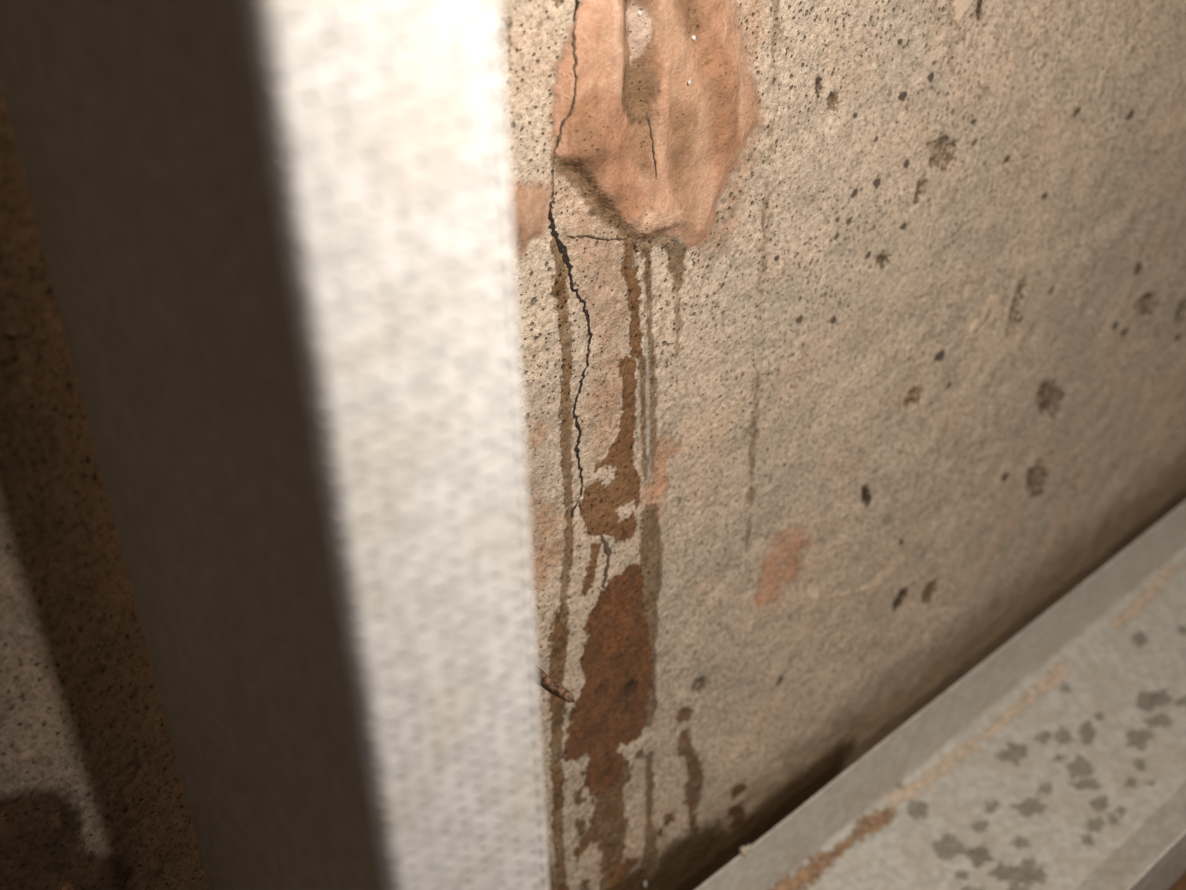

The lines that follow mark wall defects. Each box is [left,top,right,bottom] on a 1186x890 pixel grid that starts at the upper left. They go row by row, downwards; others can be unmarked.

crack [549,0,612,588]
water stain [528,0,688,890]
water stain [0,791,126,890]
rust [561,564,653,890]
rust [658,706,705,837]
water stain [622,742,852,890]
rust [728,778,747,829]